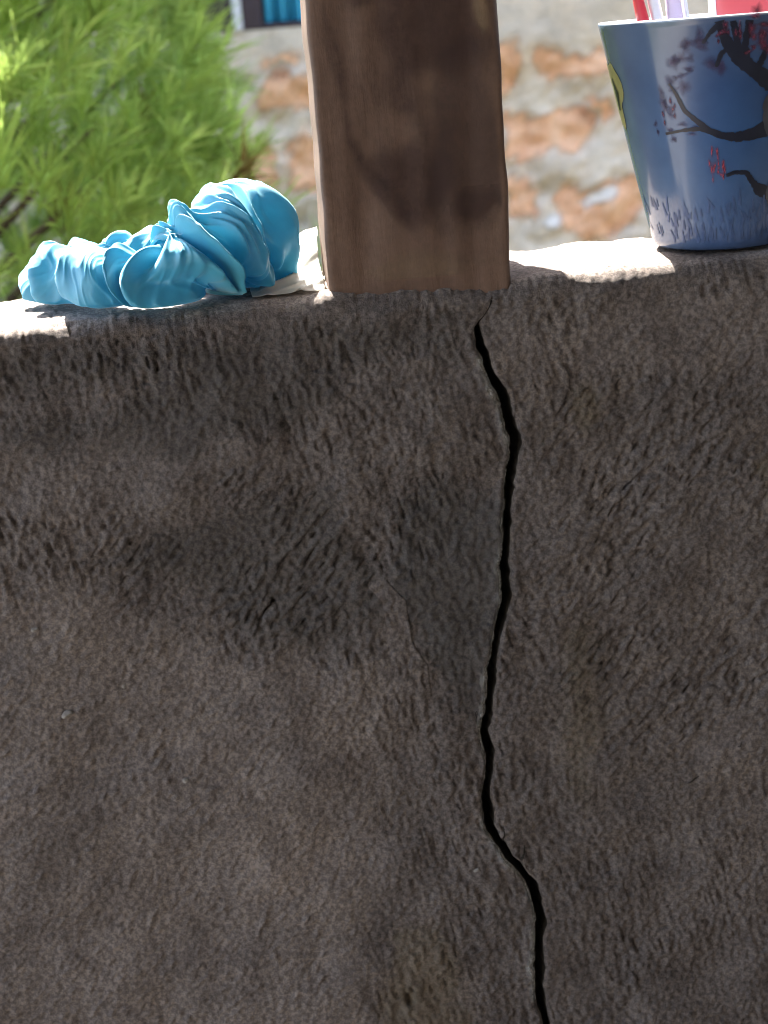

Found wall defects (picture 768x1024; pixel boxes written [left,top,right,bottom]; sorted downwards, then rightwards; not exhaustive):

crack [474,300,550,1024]